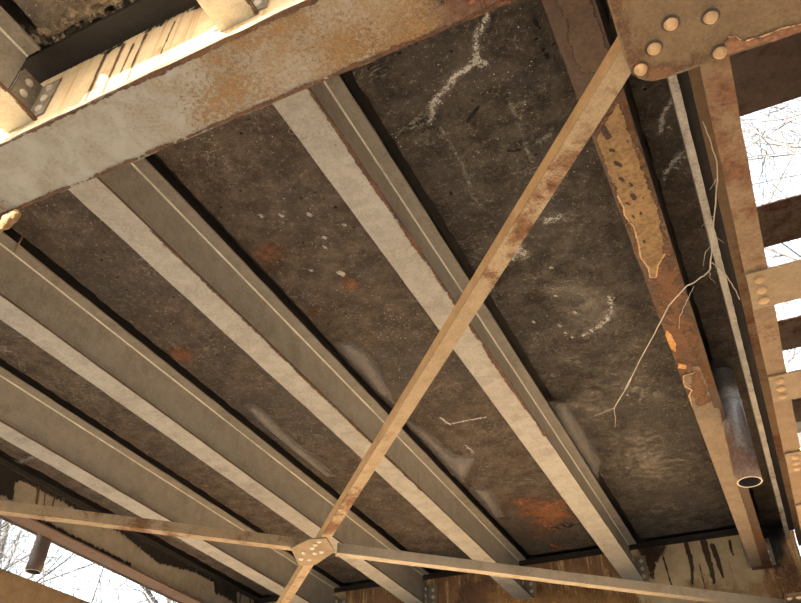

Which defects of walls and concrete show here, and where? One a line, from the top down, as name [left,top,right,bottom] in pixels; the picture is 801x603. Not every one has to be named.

peeling [557,0,608,74]
crack [400,12,490,205]
rust [0,0,515,305]
peeling [597,89,762,568]
rust [468,324,547,437]
damp [0,456,87,511]
damp [35,519,132,567]
damp [114,529,243,603]
rust [456,574,639,603]
damp [638,545,672,585]
damp [684,539,724,589]